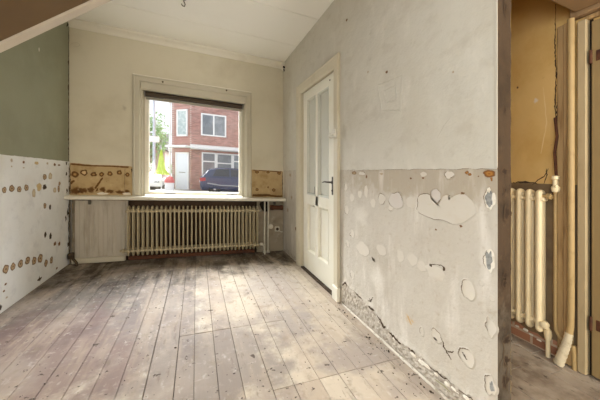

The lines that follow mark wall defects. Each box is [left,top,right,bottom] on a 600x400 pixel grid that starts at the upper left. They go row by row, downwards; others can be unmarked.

crack [551,4,559,117]
rust [481,169,497,181]
spalling [483,186,497,211]
spalling [483,248,496,274]
spalling [340,277,485,400]